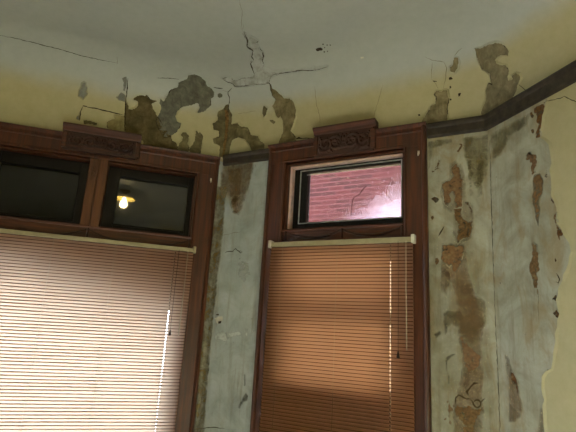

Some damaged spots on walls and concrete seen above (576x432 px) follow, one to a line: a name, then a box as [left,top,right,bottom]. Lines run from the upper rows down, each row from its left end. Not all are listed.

peeling [106,73,222,154]
peeling [211,104,266,159]
peeling [221,31,329,143]
peeling [418,56,461,123]
damp [465,130,509,184]
peeling [474,40,523,115]
spalling [525,152,537,176]
spalling [530,102,545,138]
spalling [432,164,473,272]
damp [194,163,253,432]
spalling [529,242,540,296]
spalling [444,401,481,432]